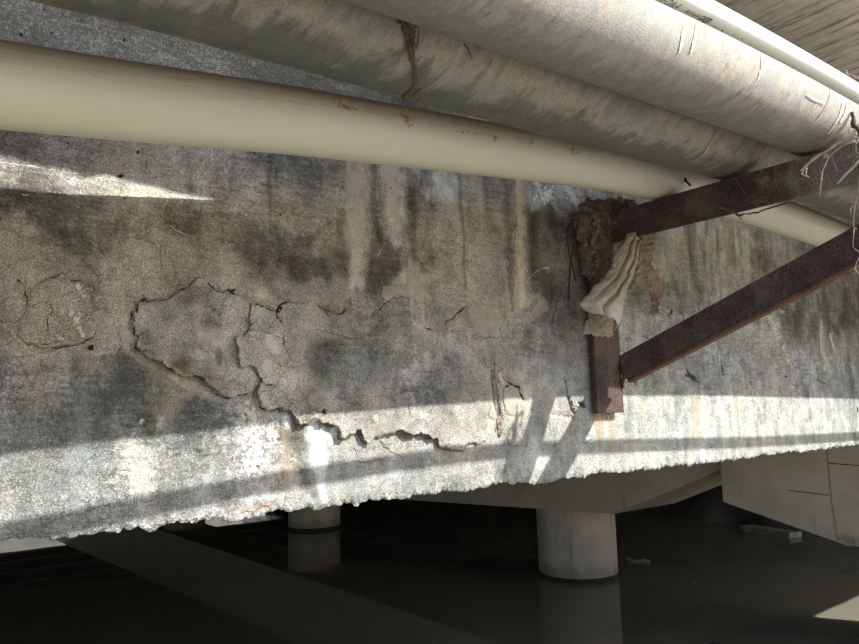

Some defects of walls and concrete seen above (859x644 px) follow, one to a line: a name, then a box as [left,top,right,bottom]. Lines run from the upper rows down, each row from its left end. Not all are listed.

water stain [348,162,367,290]
water stain [515,180,582,308]
crack [25,272,91,345]
crack [131,277,287,340]
water stain [262,336,281,376]
flaking render [118,262,519,452]
crack [314,296,418,339]
crack [436,307,527,401]
water stain [819,319,834,372]
water stain [114,417,163,520]
water stain [233,391,291,493]
water stain [305,416,336,503]